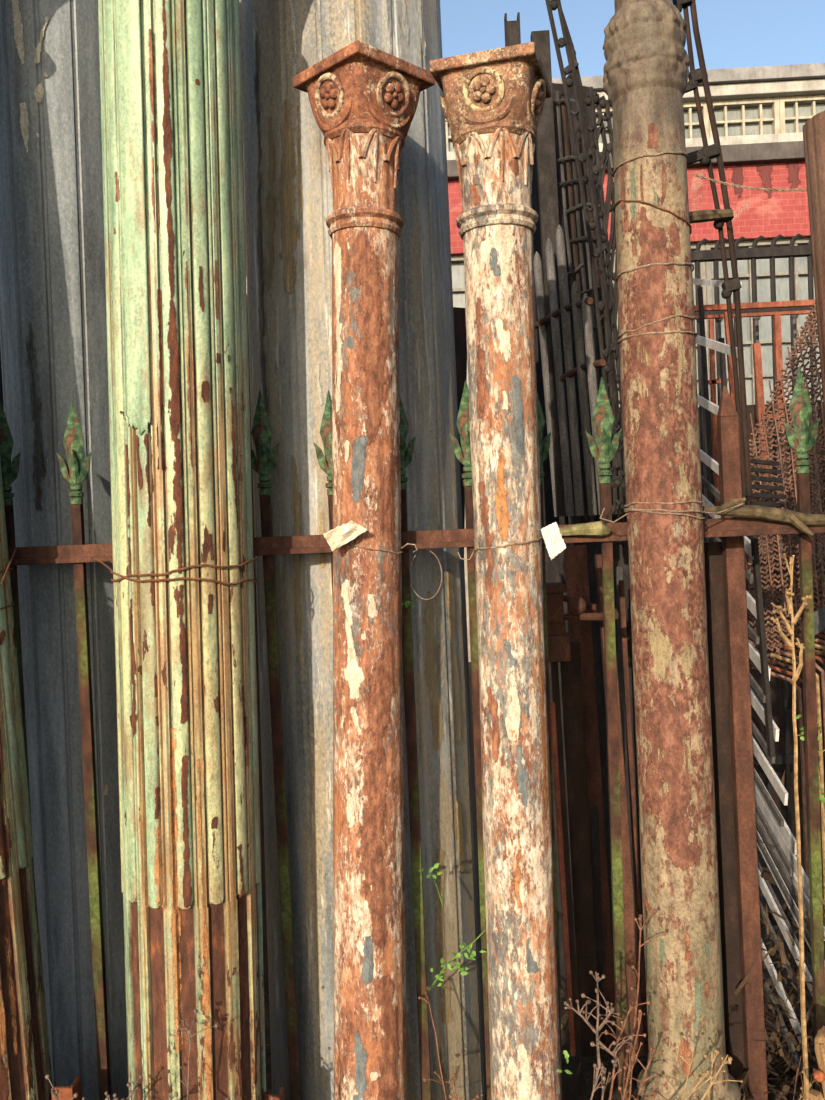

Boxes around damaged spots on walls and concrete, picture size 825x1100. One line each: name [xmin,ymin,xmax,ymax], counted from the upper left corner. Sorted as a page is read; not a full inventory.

corrosion [647,123,658,148]
peeling [479,235,517,276]
corrosion [352,230,392,445]
peeling [484,288,512,361]
peeling [136,403,167,527]
peeling [504,639,537,807]
corrosion [354,640,397,950]
corrosion [237,844,249,1023]
peeling [526,938,546,1005]
corrosion [237,1059,248,1100]
corrosion [373,974,399,1100]
peeling [516,1043,533,1100]